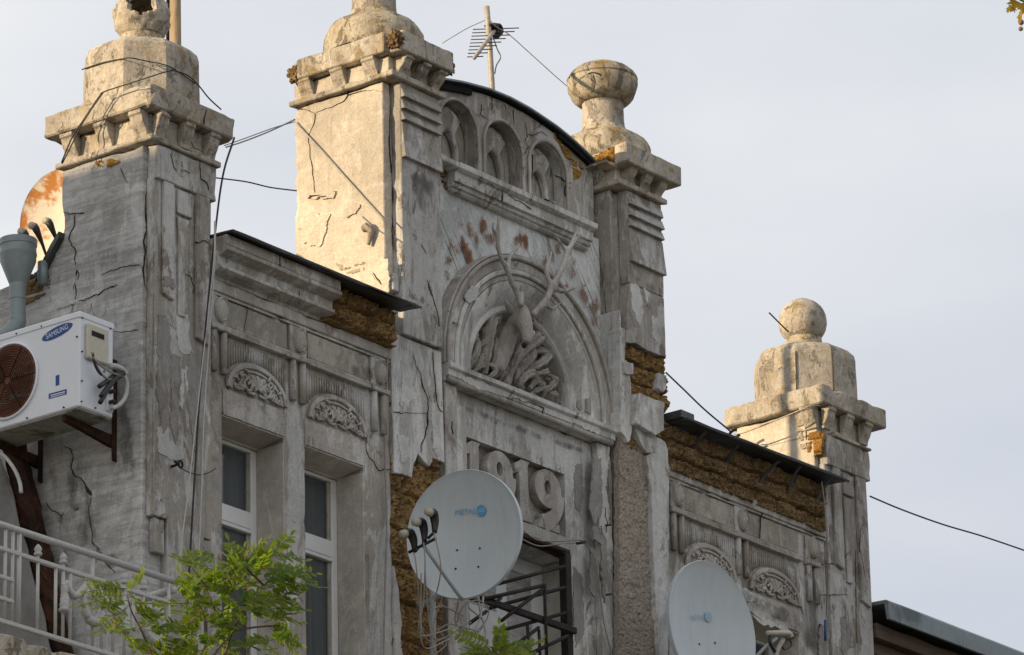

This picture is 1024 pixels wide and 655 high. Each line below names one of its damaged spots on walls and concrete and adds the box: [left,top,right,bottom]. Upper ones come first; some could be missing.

crack [296,84,394,246]
crack [63,168,147,314]
rust [445,218,496,263]
crack [46,445,115,572]
spalling [389,410,445,655]
crack [395,352,454,453]
peeling [461,375,503,397]
spalling [572,283,670,655]
spalling [794,411,826,457]